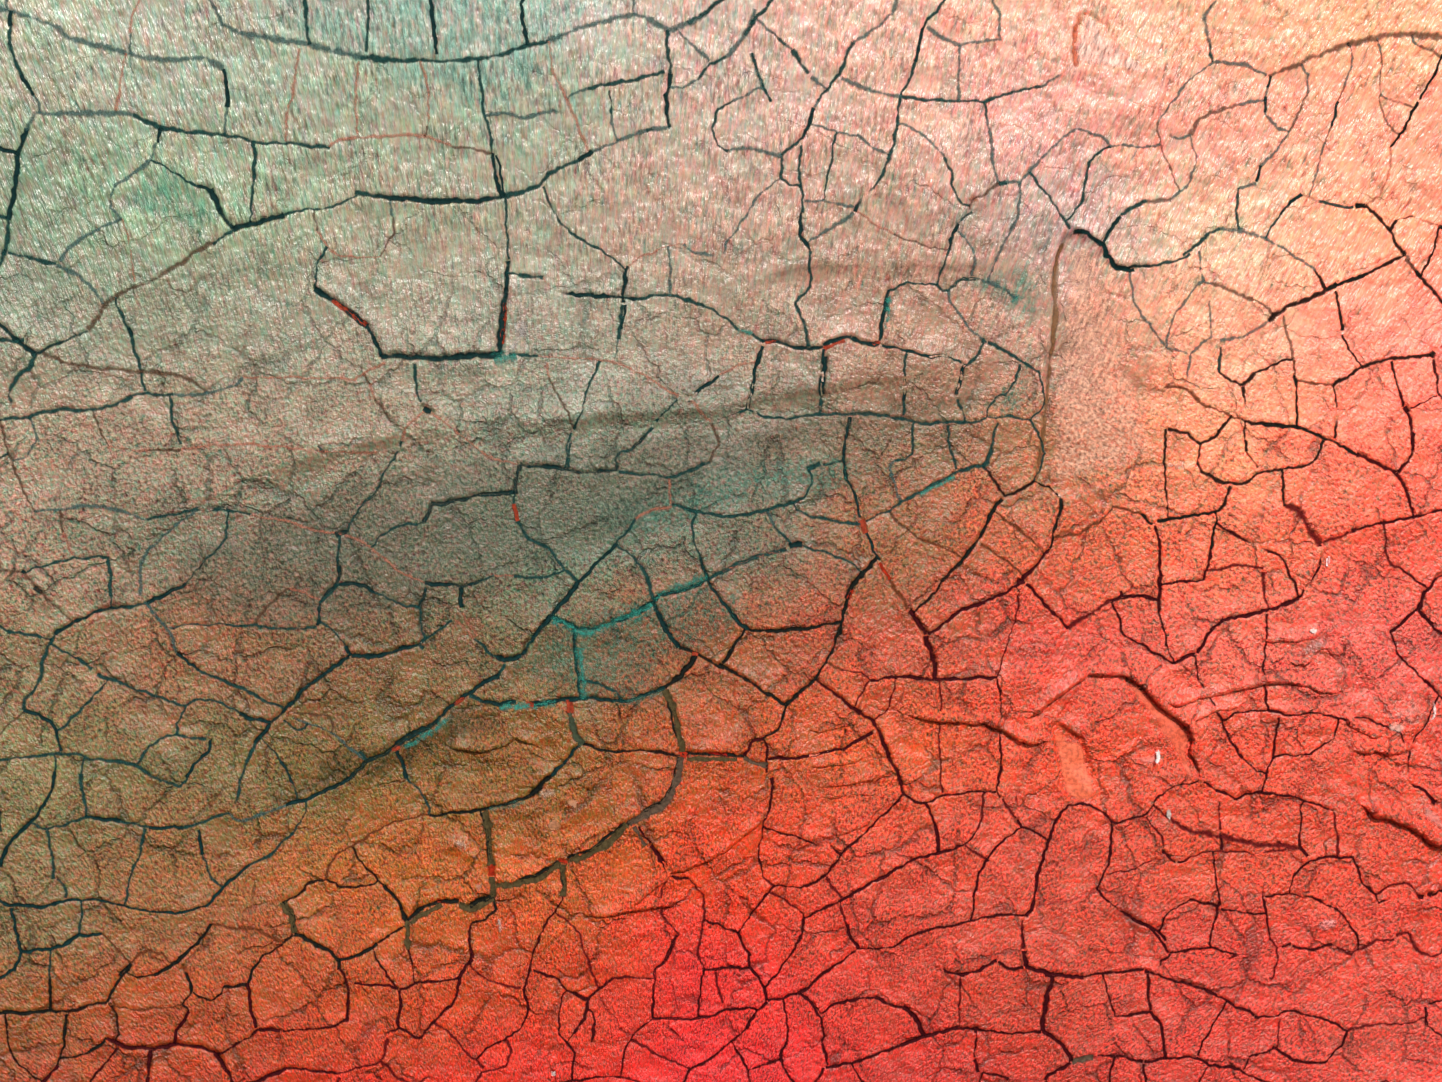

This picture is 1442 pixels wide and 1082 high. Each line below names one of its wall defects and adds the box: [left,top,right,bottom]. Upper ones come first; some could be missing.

crack [0,251,233,596]
crack [362,374,400,426]
crack [0,441,768,1082]
crack [0,0,809,281]
crack [313,246,543,364]
crack [811,0,898,107]
crack [371,107,1442,1082]
crack [841,0,1442,376]